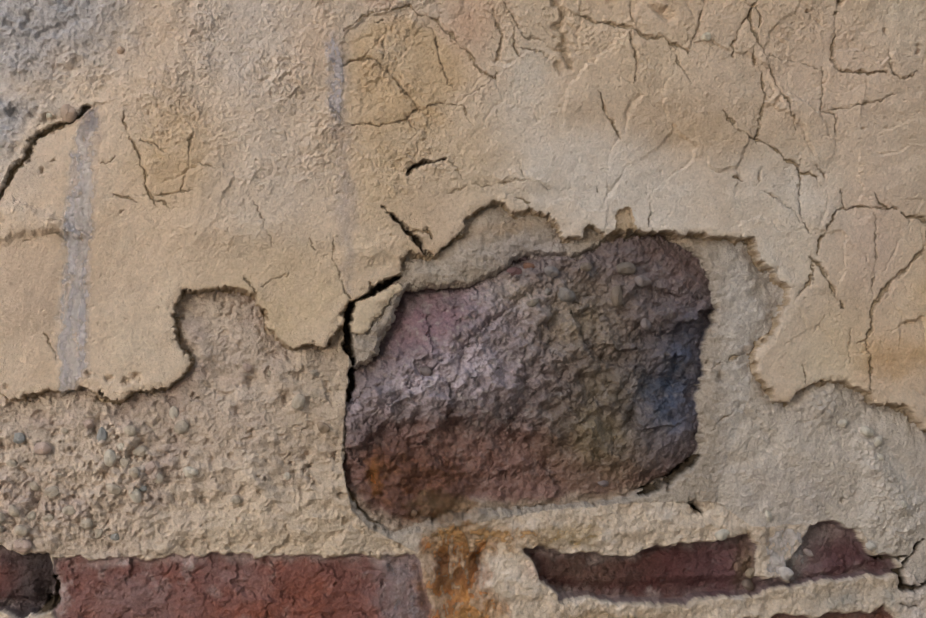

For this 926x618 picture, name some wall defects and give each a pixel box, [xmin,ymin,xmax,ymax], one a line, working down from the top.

crack [344,4,532,90]
crack [723,4,825,196]
crack [0,106,91,200]
crack [116,116,211,213]
crack [406,158,446,174]
crack [381,206,456,256]
crack [804,196,926,376]
crack [339,271,400,402]
spalling [0,201,926,559]
corrosion [422,522,537,618]
crack [867,538,926,606]
spalling [898,528,926,590]